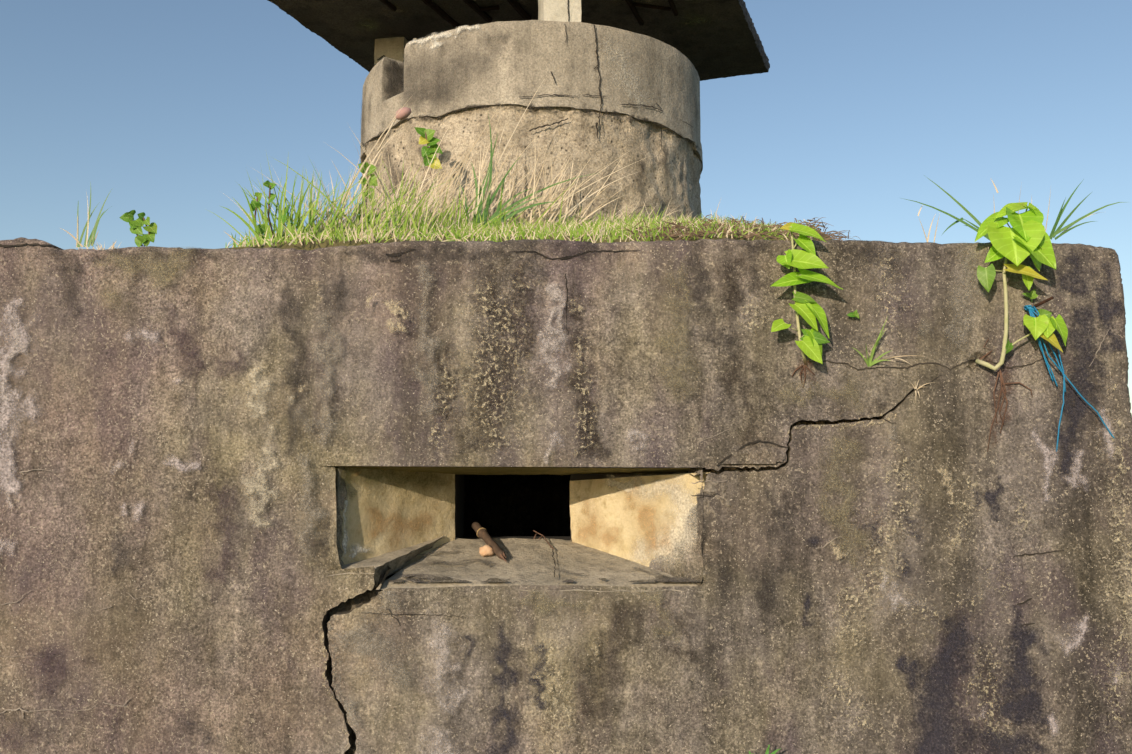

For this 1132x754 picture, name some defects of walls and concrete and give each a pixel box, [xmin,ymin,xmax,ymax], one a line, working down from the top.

crack [522,0,690,149]
water stain [0,299,37,504]
water stain [345,245,487,418]
water stain [461,269,530,450]
water stain [527,276,609,457]
crack [688,357,1047,476]
crack [320,565,463,754]
water stain [896,612,1057,754]
water stain [1063,616,1088,653]